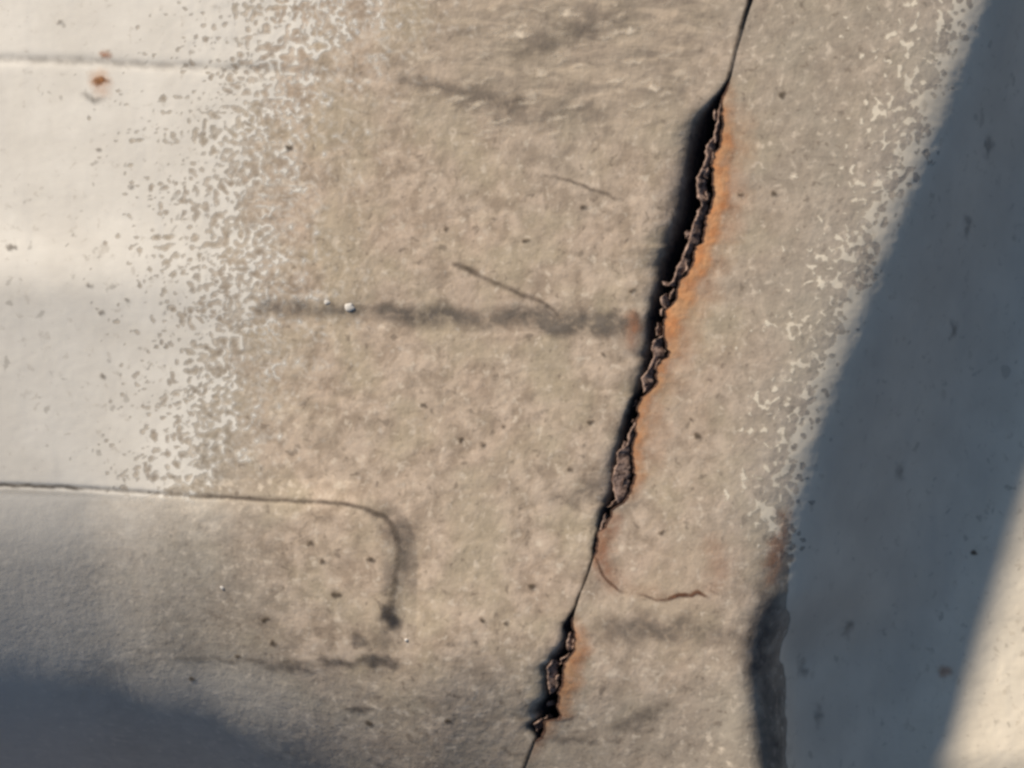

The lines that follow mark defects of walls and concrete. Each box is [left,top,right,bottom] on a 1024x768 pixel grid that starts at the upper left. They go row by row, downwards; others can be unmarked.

crack [739,0,752,34]
leakage [377,305,639,335]
crack [523,63,732,768]
rust [633,109,732,470]